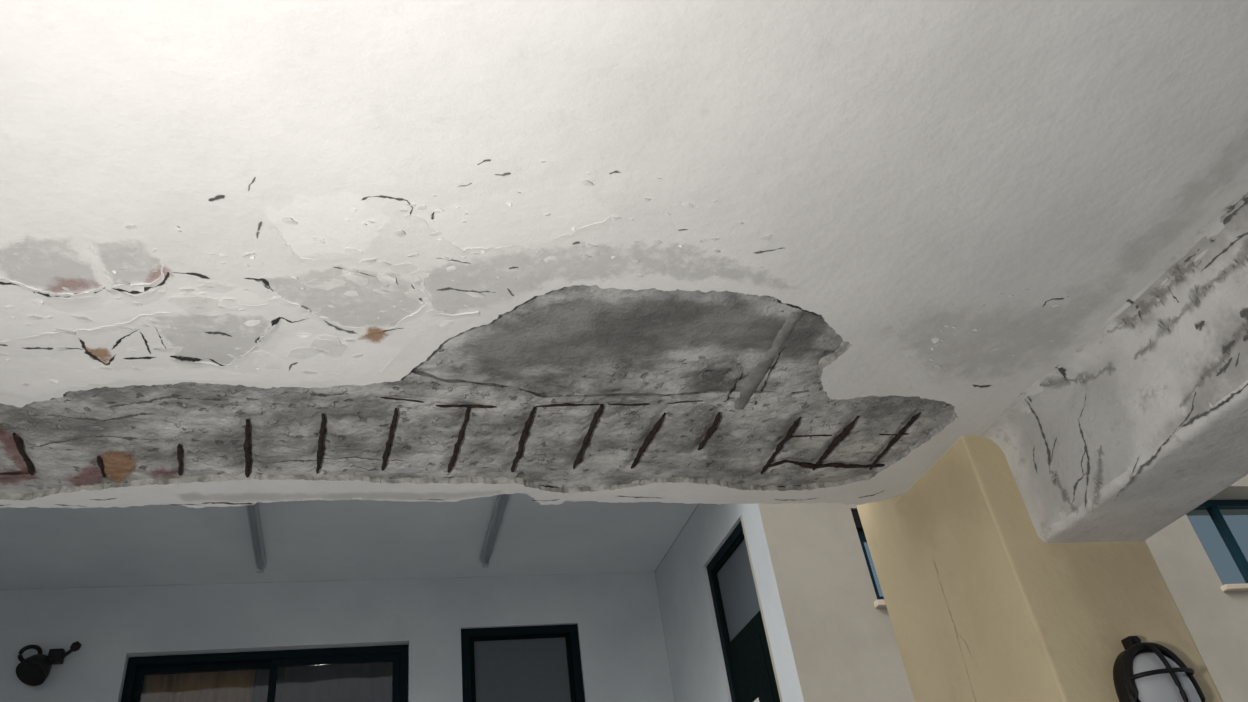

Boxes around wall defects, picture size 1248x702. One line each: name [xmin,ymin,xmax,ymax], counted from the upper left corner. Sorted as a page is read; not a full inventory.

crack [1185,196,1248,270]
spalling [0,159,958,507]
corrosion [71,451,136,485]
crack [1018,367,1248,507]